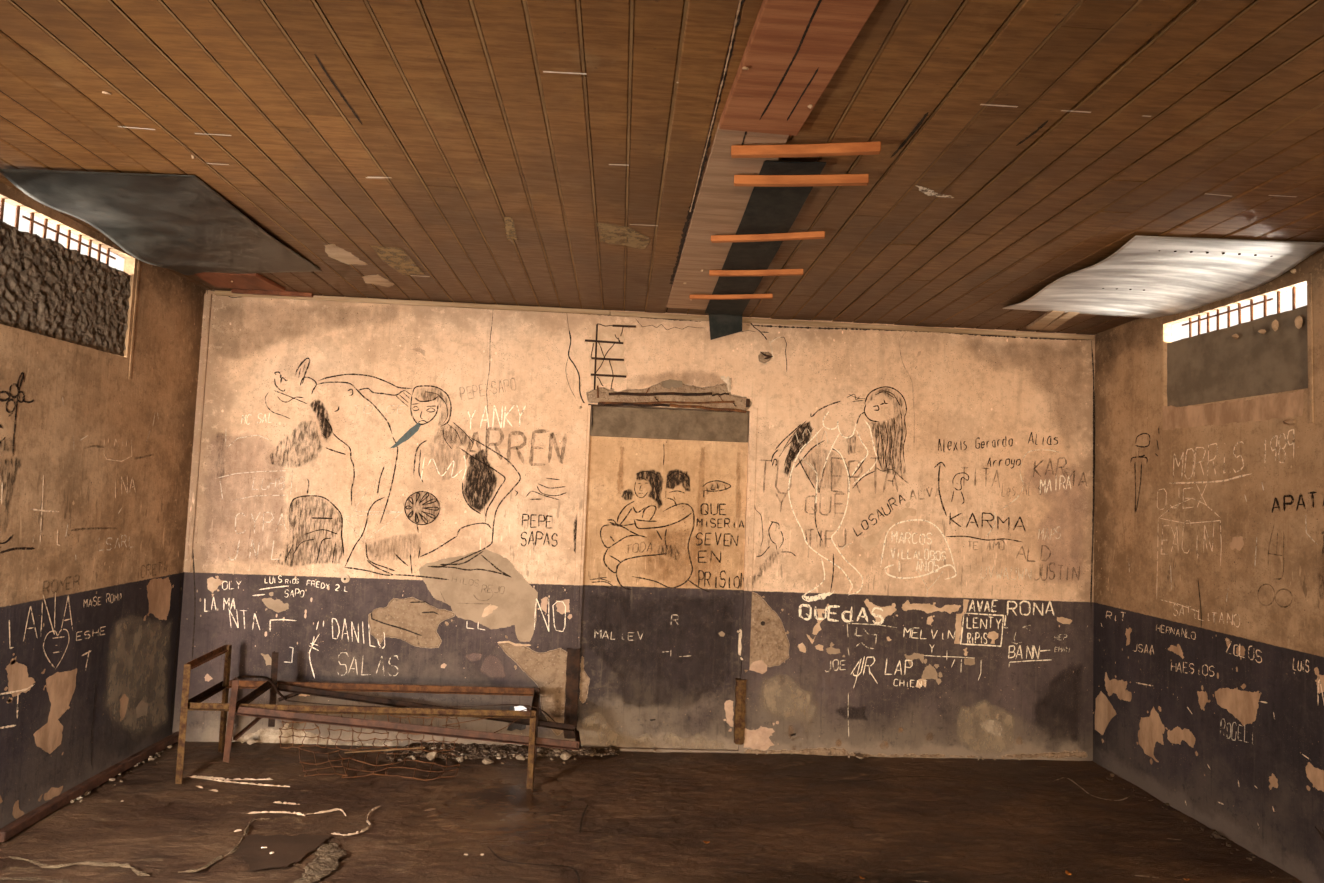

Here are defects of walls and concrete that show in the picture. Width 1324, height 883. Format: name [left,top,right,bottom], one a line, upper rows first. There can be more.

flaking render [579,324,752,413]
peeling [143,577,174,621]
flaking render [368,597,460,648]
peeling [537,597,572,619]
flaking render [719,592,845,674]
peeling [864,599,975,666]
peeling [4,653,77,755]
flaking render [724,700,978,758]
peeling [905,653,943,688]
peeling [1197,684,1261,726]
peeling [1314,667,1324,694]
peeling [1305,762,1324,792]